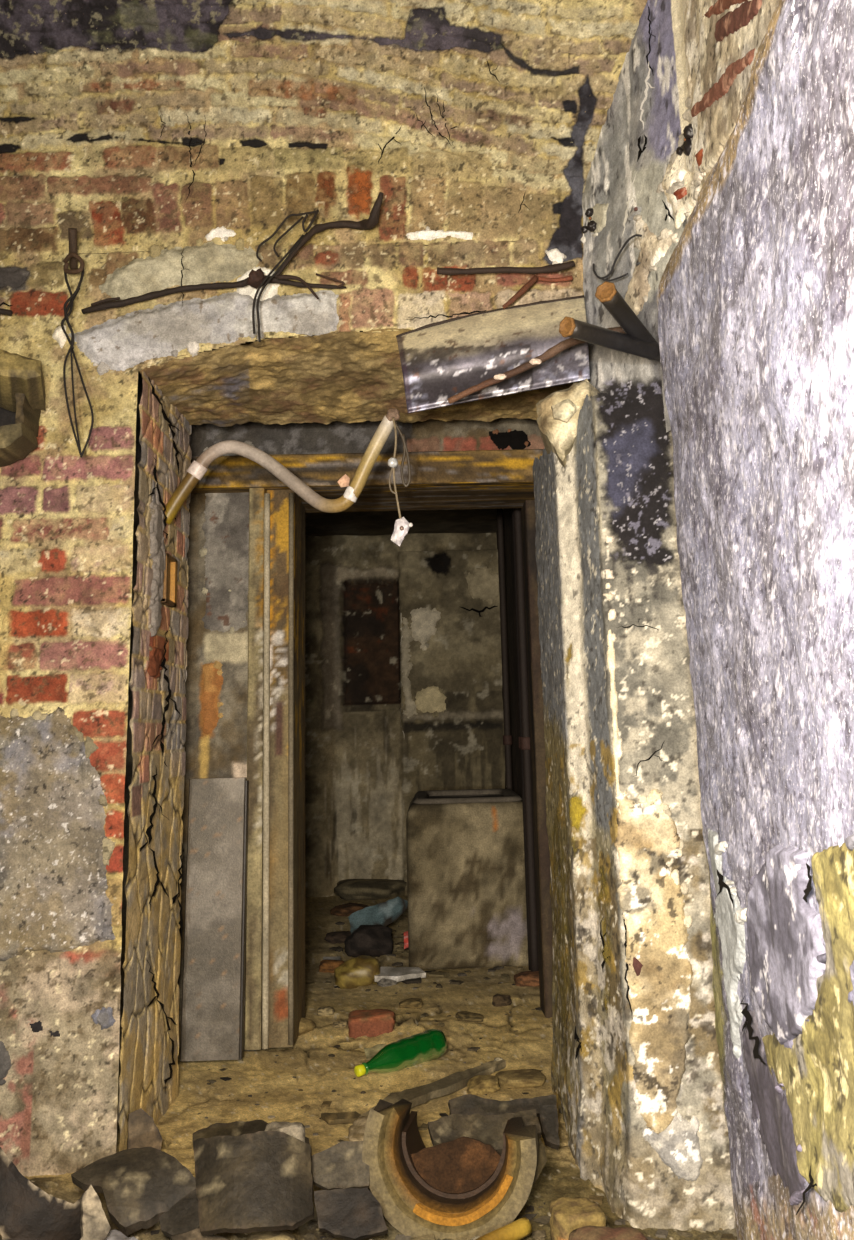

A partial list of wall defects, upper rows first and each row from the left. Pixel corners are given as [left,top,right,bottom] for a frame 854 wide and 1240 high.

peeling [624,0,780,316]
crack [148,377,183,542]
peeling [0,707,116,961]
crack [140,630,184,942]
spalling [603,569,693,1134]
crack [147,960,177,1092]
peeling [708,828,854,1213]